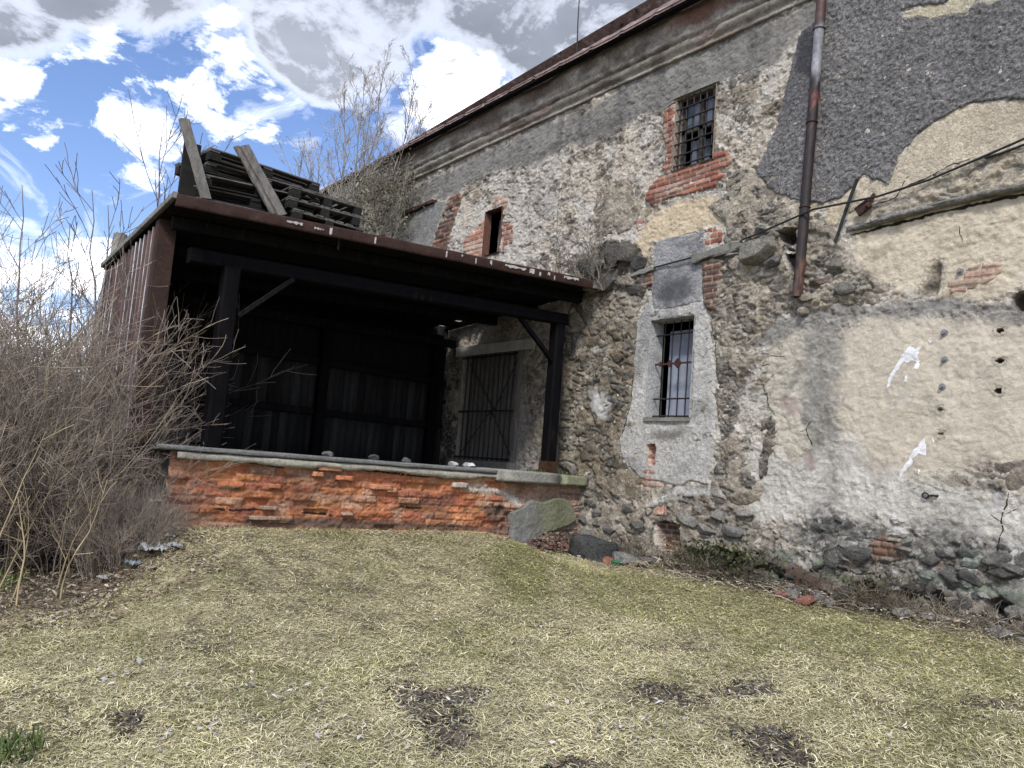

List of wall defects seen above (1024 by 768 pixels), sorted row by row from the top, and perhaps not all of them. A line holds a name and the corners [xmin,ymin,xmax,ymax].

spalling [463,221,484,257]
spalling [502,223,515,255]
spalling [557,83,1024,628]
crack [990,493,1016,551]